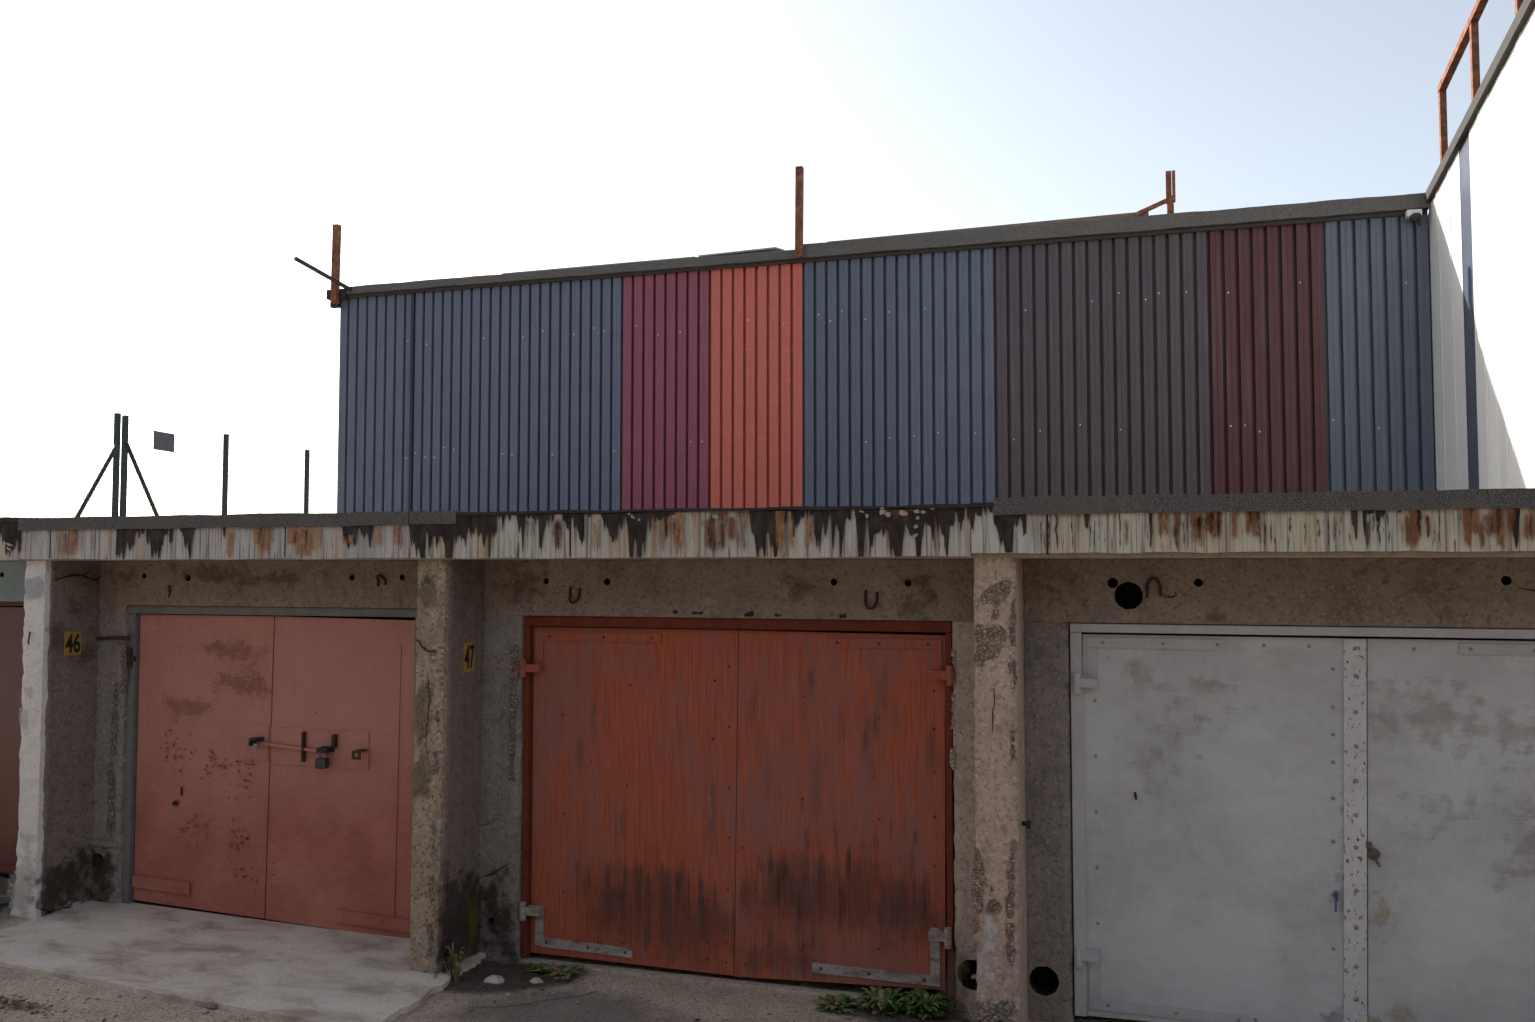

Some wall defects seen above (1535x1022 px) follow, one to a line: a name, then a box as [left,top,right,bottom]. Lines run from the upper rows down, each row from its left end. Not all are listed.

rust [254,526,321,555]
rust [552,520,561,549]
rust [653,511,748,551]
rust [776,511,809,550]
rust [1159,512,1260,545]
rust [1405,510,1431,546]
rust [1463,508,1535,548]